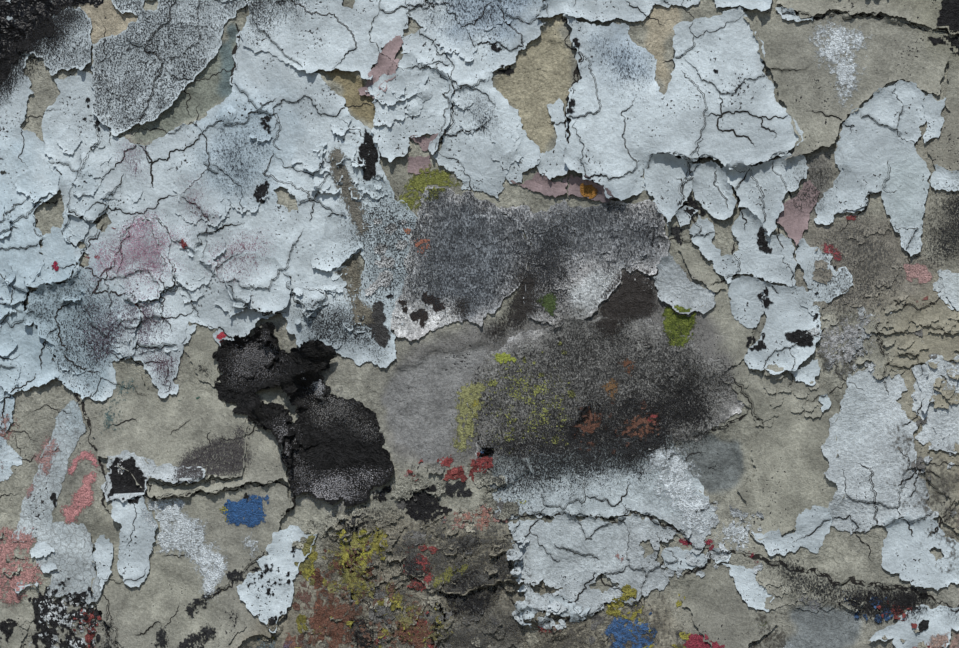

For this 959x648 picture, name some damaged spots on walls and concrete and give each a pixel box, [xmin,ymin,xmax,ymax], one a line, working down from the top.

crack [291,0,805,294]
crack [812,81,921,144]
crack [0,0,384,514]
peeling [0,436,23,482]
crack [128,419,296,544]
flaking render [300,504,430,648]
spalling [390,462,446,501]
peeling [401,433,716,648]
crack [478,445,959,641]
crack [664,322,923,468]
peeling [869,604,959,648]
spalling [929,377,959,409]